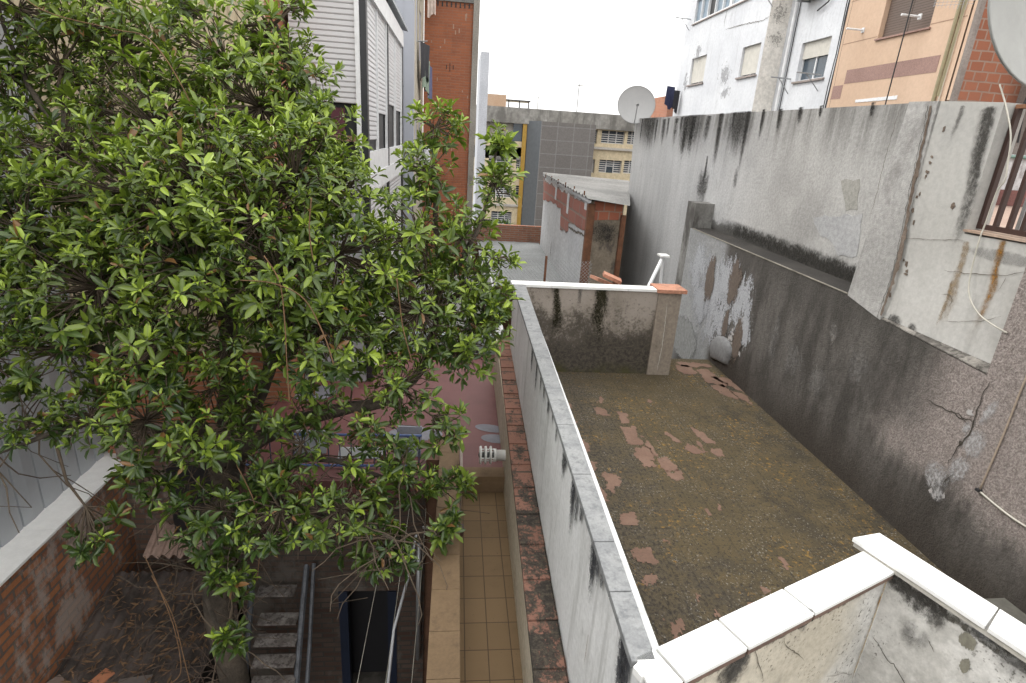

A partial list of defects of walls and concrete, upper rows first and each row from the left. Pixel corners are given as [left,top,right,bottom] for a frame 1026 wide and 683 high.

leakage [640,109,765,197]
leakage [961,107,993,227]
leakage [592,290,607,336]
peeling [688,239,754,364]
corrosion [981,242,1005,314]
peeling [675,364,753,405]
peeling [582,439,622,501]
peeling [634,432,724,481]
crack [927,381,990,489]
leakage [589,543,603,588]
peeling [630,547,659,586]
leakage [615,637,630,683]